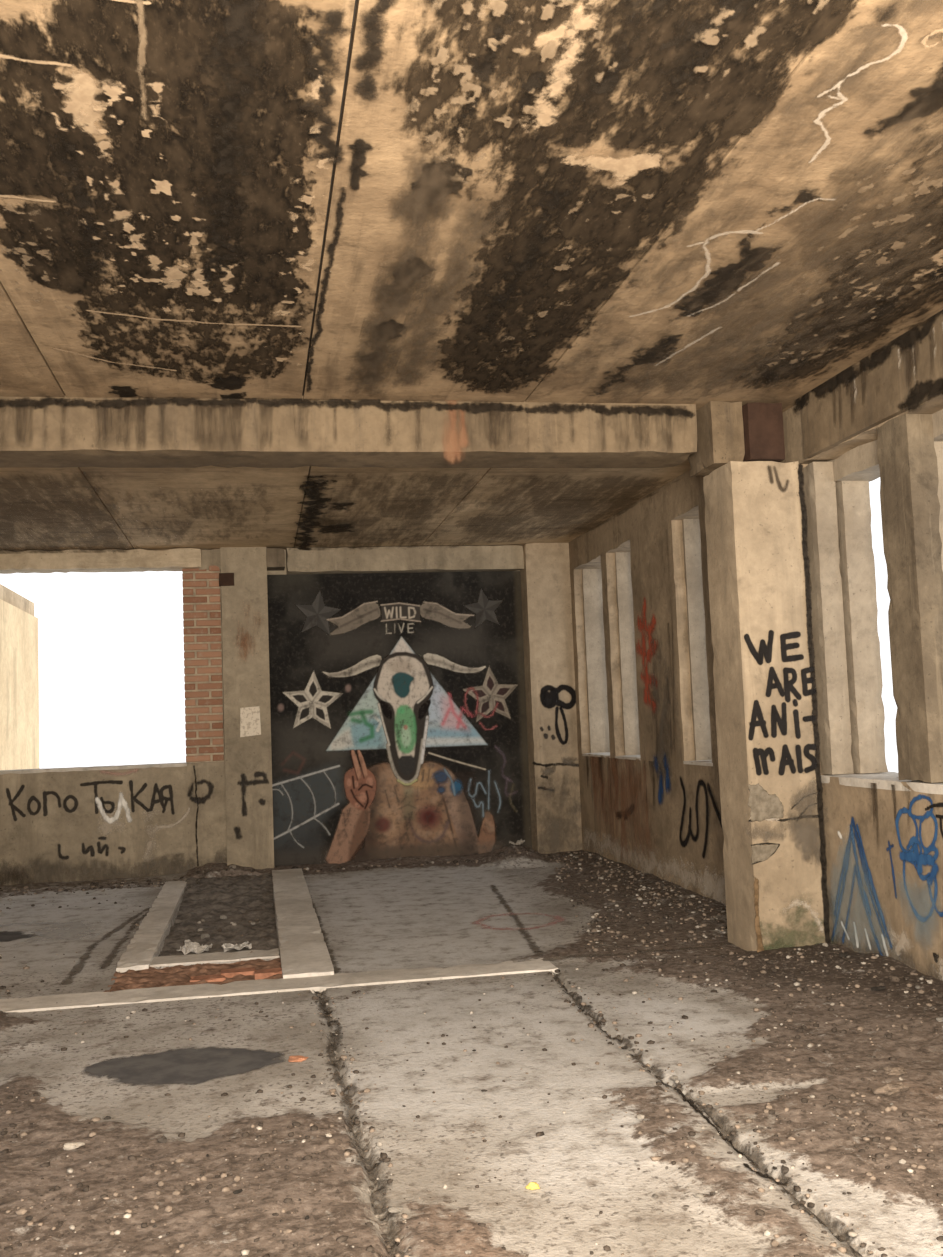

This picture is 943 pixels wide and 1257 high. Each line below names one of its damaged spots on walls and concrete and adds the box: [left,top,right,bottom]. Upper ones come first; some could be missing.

leakage [0,0,943,420]
leakage [290,475,355,550]
crack [312,902,403,1257]
crack [490,885,863,1257]